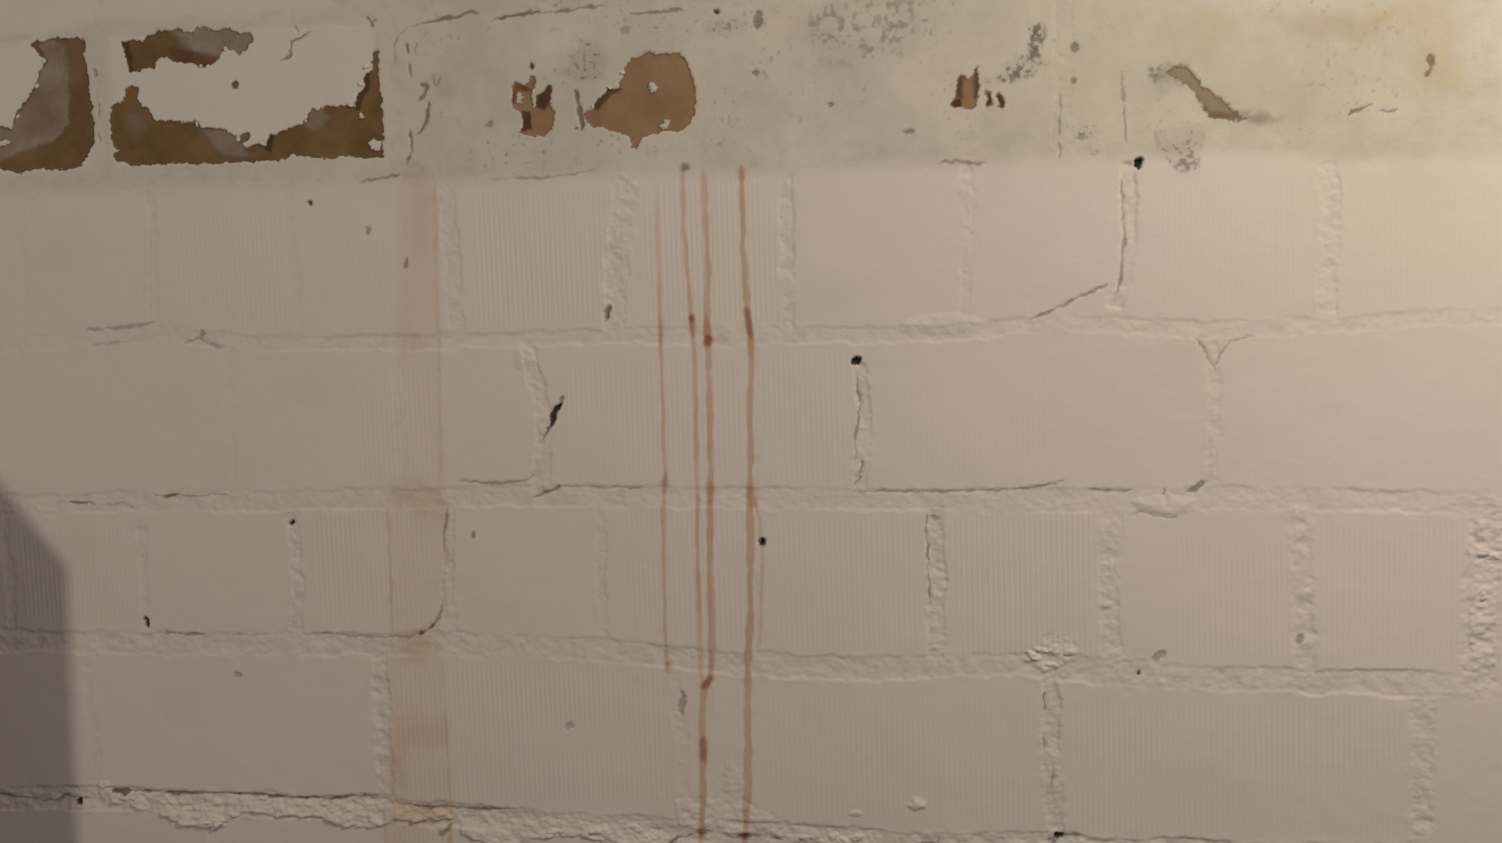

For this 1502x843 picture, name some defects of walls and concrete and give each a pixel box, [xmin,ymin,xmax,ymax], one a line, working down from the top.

peeling [0,27,384,175]
peeling [512,76,555,137]
peeling [584,52,696,149]
peeling [951,68,1005,109]
peeling [1167,66,1243,122]
crack [113,788,201,796]
crack [238,792,372,800]